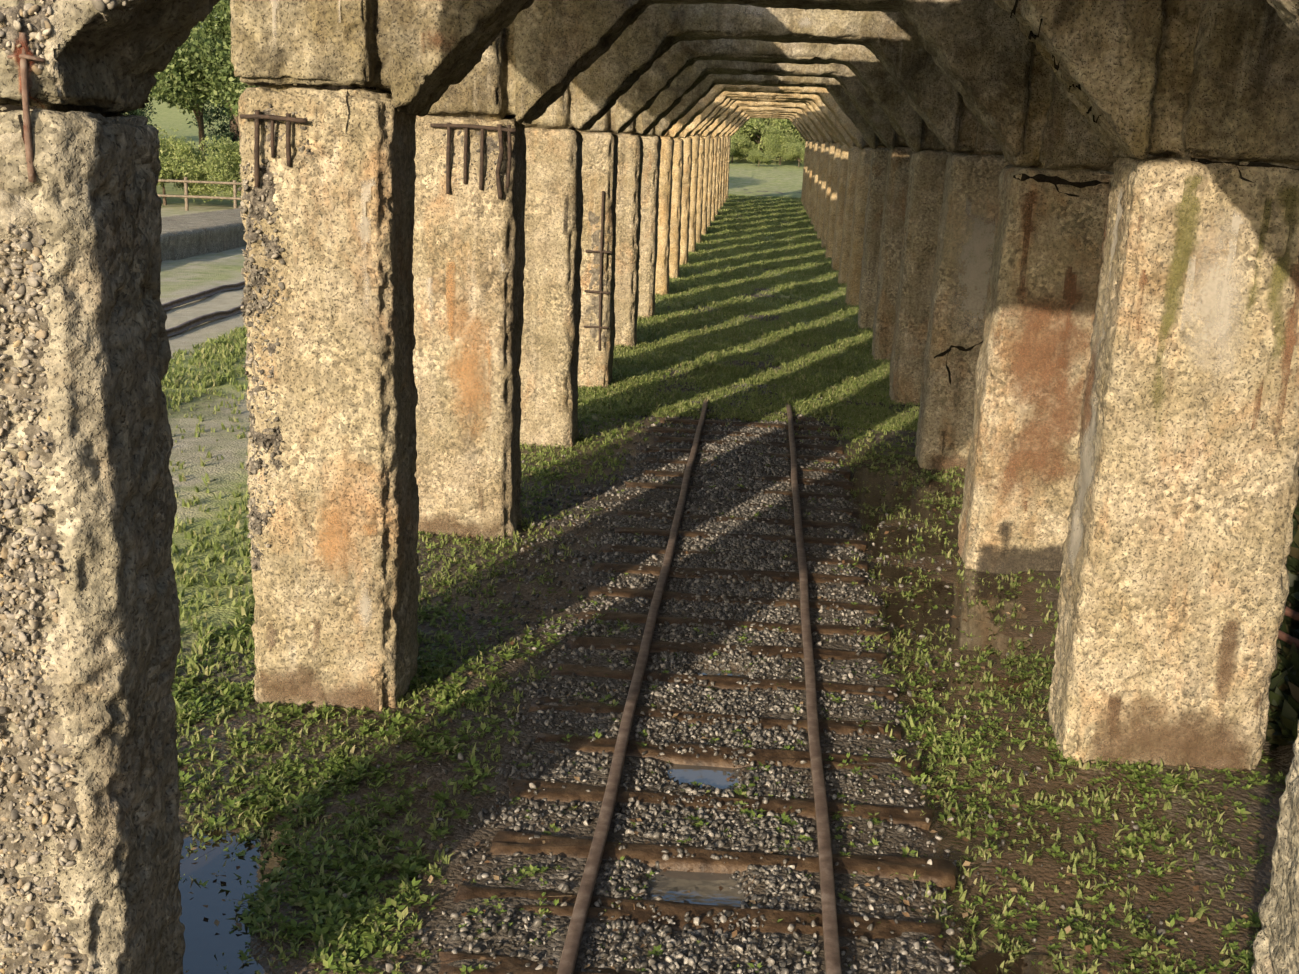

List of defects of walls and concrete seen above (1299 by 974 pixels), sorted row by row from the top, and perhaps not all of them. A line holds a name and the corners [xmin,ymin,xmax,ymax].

rust [15,42,44,112]
crack [1010,0,1101,123]
crack [1013,173,1109,197]
leakage [1180,187,1299,354]
crack [934,341,983,384]
rust [1003,191,1095,492]